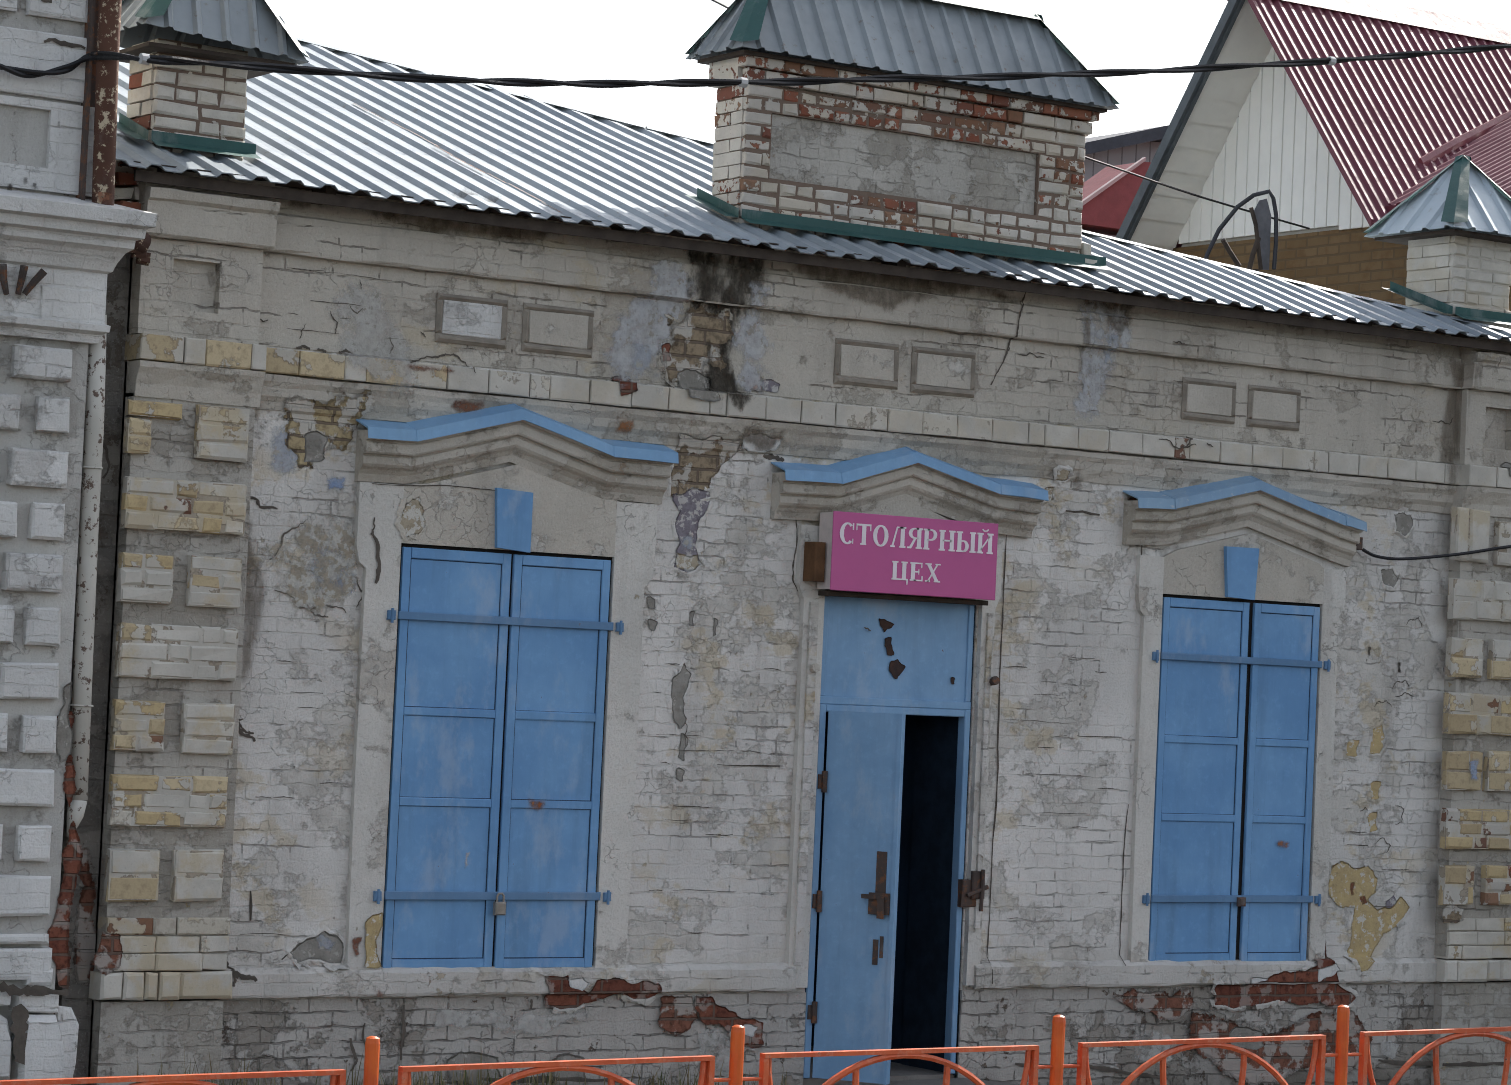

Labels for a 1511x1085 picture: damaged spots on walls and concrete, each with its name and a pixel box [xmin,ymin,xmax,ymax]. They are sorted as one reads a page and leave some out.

peeling [283,286,415,469]
water stain [609,251,768,409]
spalling [656,304,734,402]
spalling [745,379,780,393]
water stain [743,427,782,449]
crack [990,292,1044,385]
spalling [666,432,783,578]
peeling [665,658,695,782]
spalling [47,681,123,989]
peeling [282,913,383,971]
spalling [435,970,764,1070]
spalling [1113,859,1413,1085]